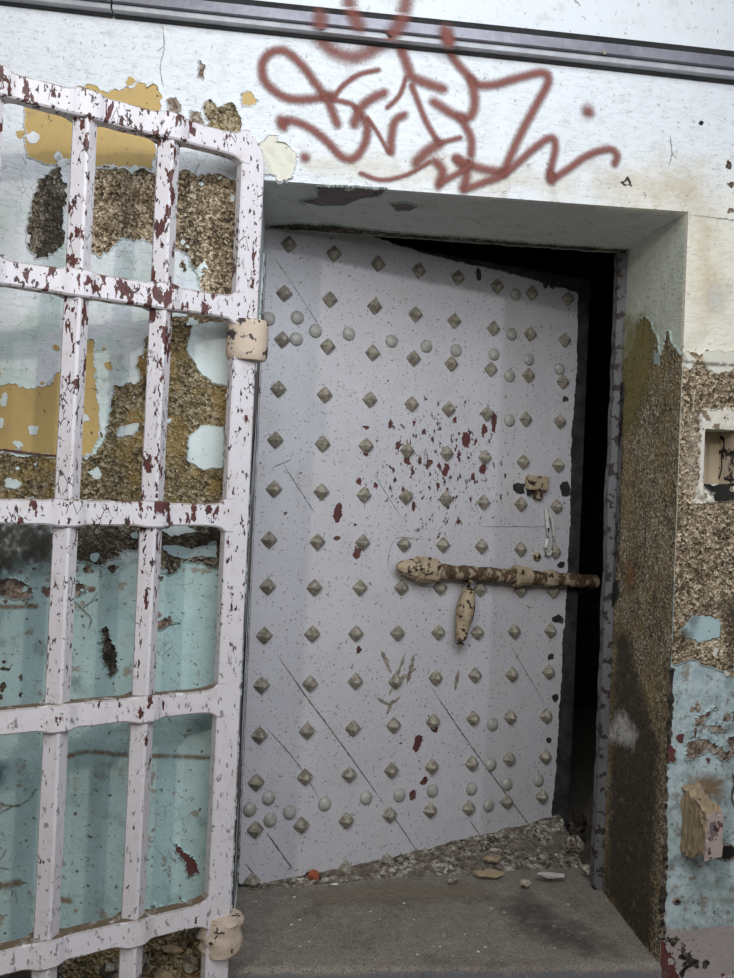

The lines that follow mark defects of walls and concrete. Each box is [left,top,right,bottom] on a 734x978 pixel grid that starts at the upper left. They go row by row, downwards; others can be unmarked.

peeling [70,76,260,132]
peeling [16,106,72,261]
peeling [91,127,157,260]
peeling [175,168,237,294]
peeling [0,370,60,499]
peeling [80,334,148,501]
peeling [164,314,228,503]
peeling [75,525,139,605]
peeling [160,526,221,581]
peeling [603,315,734,978]